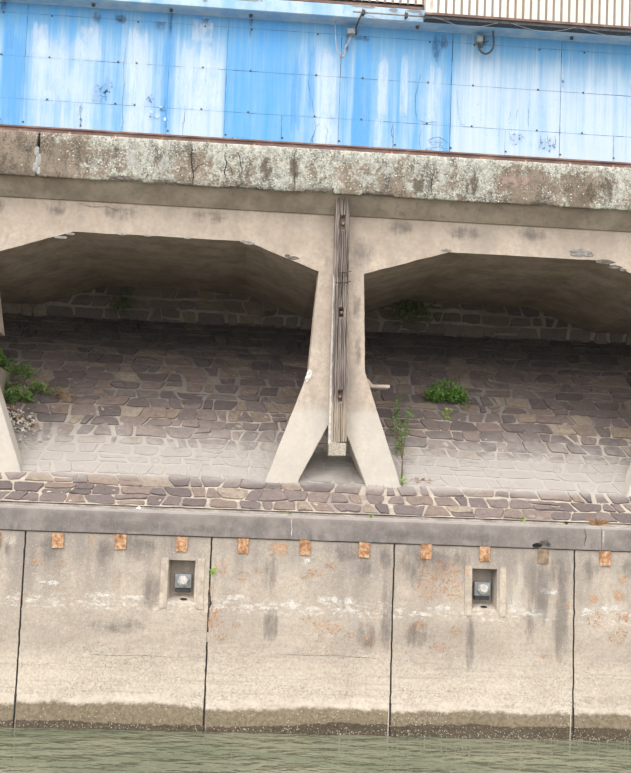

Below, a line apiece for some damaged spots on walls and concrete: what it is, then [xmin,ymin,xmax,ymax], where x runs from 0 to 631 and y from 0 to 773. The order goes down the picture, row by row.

crack [163,99,203,184]